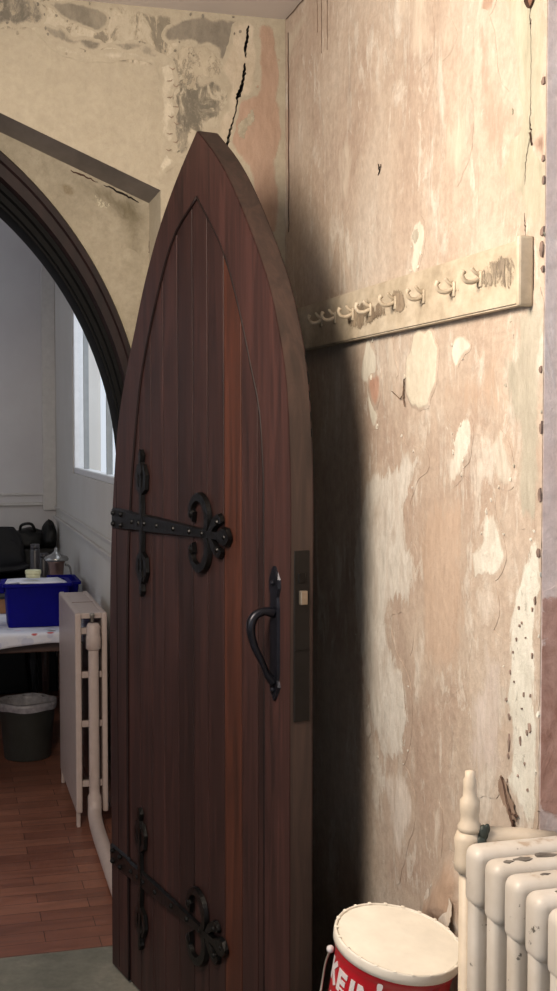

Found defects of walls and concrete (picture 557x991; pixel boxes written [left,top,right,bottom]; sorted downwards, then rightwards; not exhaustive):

crack [71,170,139,203]
flaking render [0,0,285,248]
crack [226,26,249,145]
crack [286,0,322,232]
peeling [408,215,426,273]
peeling [480,0,548,273]
peeling [349,287,557,831]